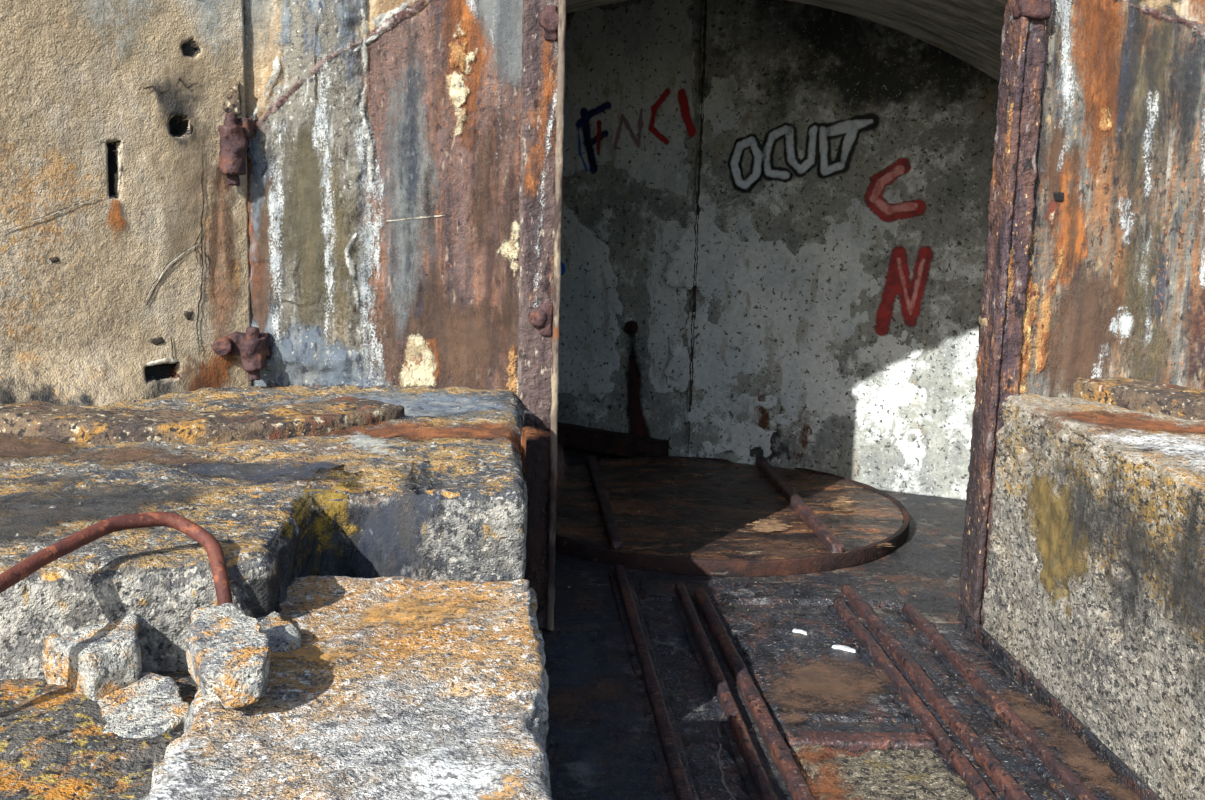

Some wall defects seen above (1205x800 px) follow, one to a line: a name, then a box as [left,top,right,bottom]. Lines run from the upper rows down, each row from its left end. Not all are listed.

rust [1190,0,1205,24]
peeling [446,25,478,135]
rust [366,0,557,395]
rust [1044,0,1121,393]
peeling [399,334,439,387]
rust [1187,286,1205,375]
rust [763,658,891,723]
rust [797,745,855,800]